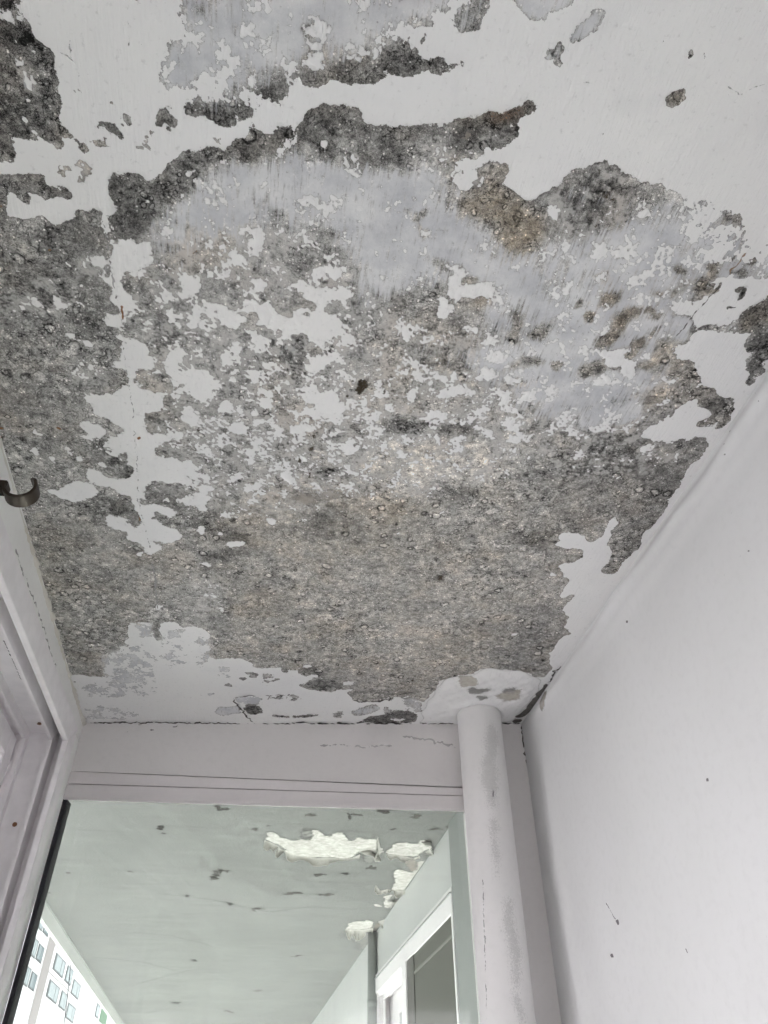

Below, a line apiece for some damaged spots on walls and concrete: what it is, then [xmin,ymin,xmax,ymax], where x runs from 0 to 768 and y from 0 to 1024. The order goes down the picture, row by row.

peeling [0,0,768,723]
peeling [252,825,433,949]